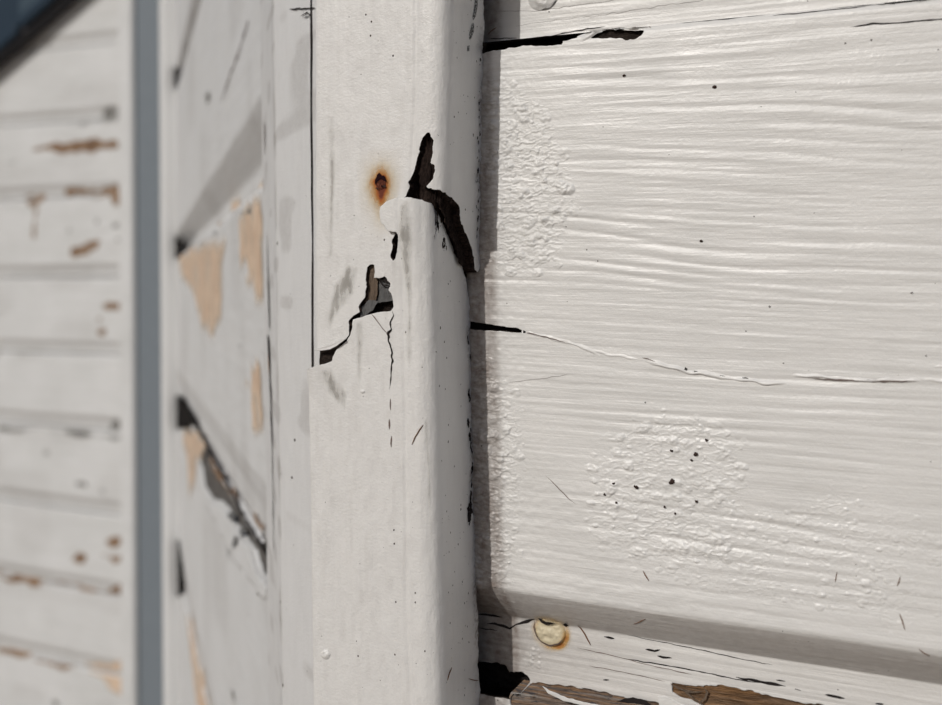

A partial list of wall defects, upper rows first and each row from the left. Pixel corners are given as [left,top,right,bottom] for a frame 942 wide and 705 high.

crack [490,0,942,51]
peeling [33,138,118,154]
peeling [65,185,119,205]
corrosion [369,167,390,206]
peeling [239,199,263,301]
peeling [179,231,223,337]
peeling [315,338,345,351]
crack [470,322,942,386]
peeling [183,395,267,600]
corrosion [552,631,569,649]
crack [478,613,801,691]
peeling [509,680,822,705]